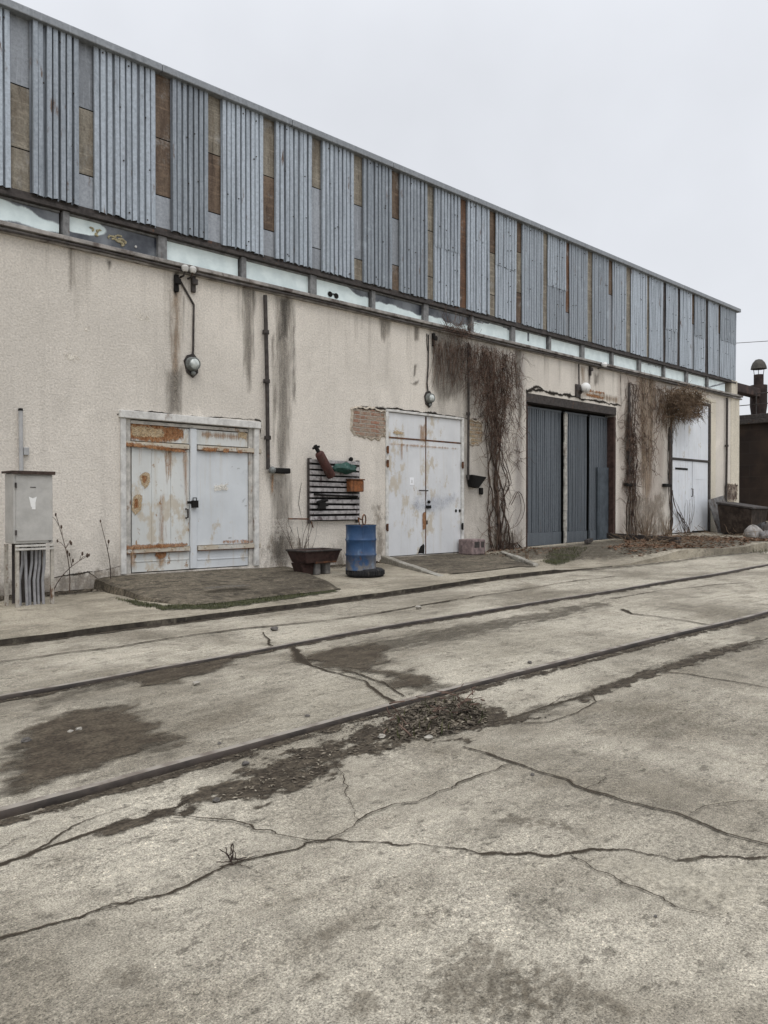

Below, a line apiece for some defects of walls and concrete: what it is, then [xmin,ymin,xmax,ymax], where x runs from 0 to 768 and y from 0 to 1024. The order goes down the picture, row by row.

rust [131,472,150,515]
rust [126,423,188,479]
leakage [170,292,182,412]
rust [126,525,260,564]
rust [201,432,260,454]
leakage [244,288,254,380]
leakage [273,482,288,565]
leakage [274,298,294,467]
spalling [350,406,386,441]
rust [389,417,461,554]
leakage [0,678,186,794]
crack [0,746,768,939]